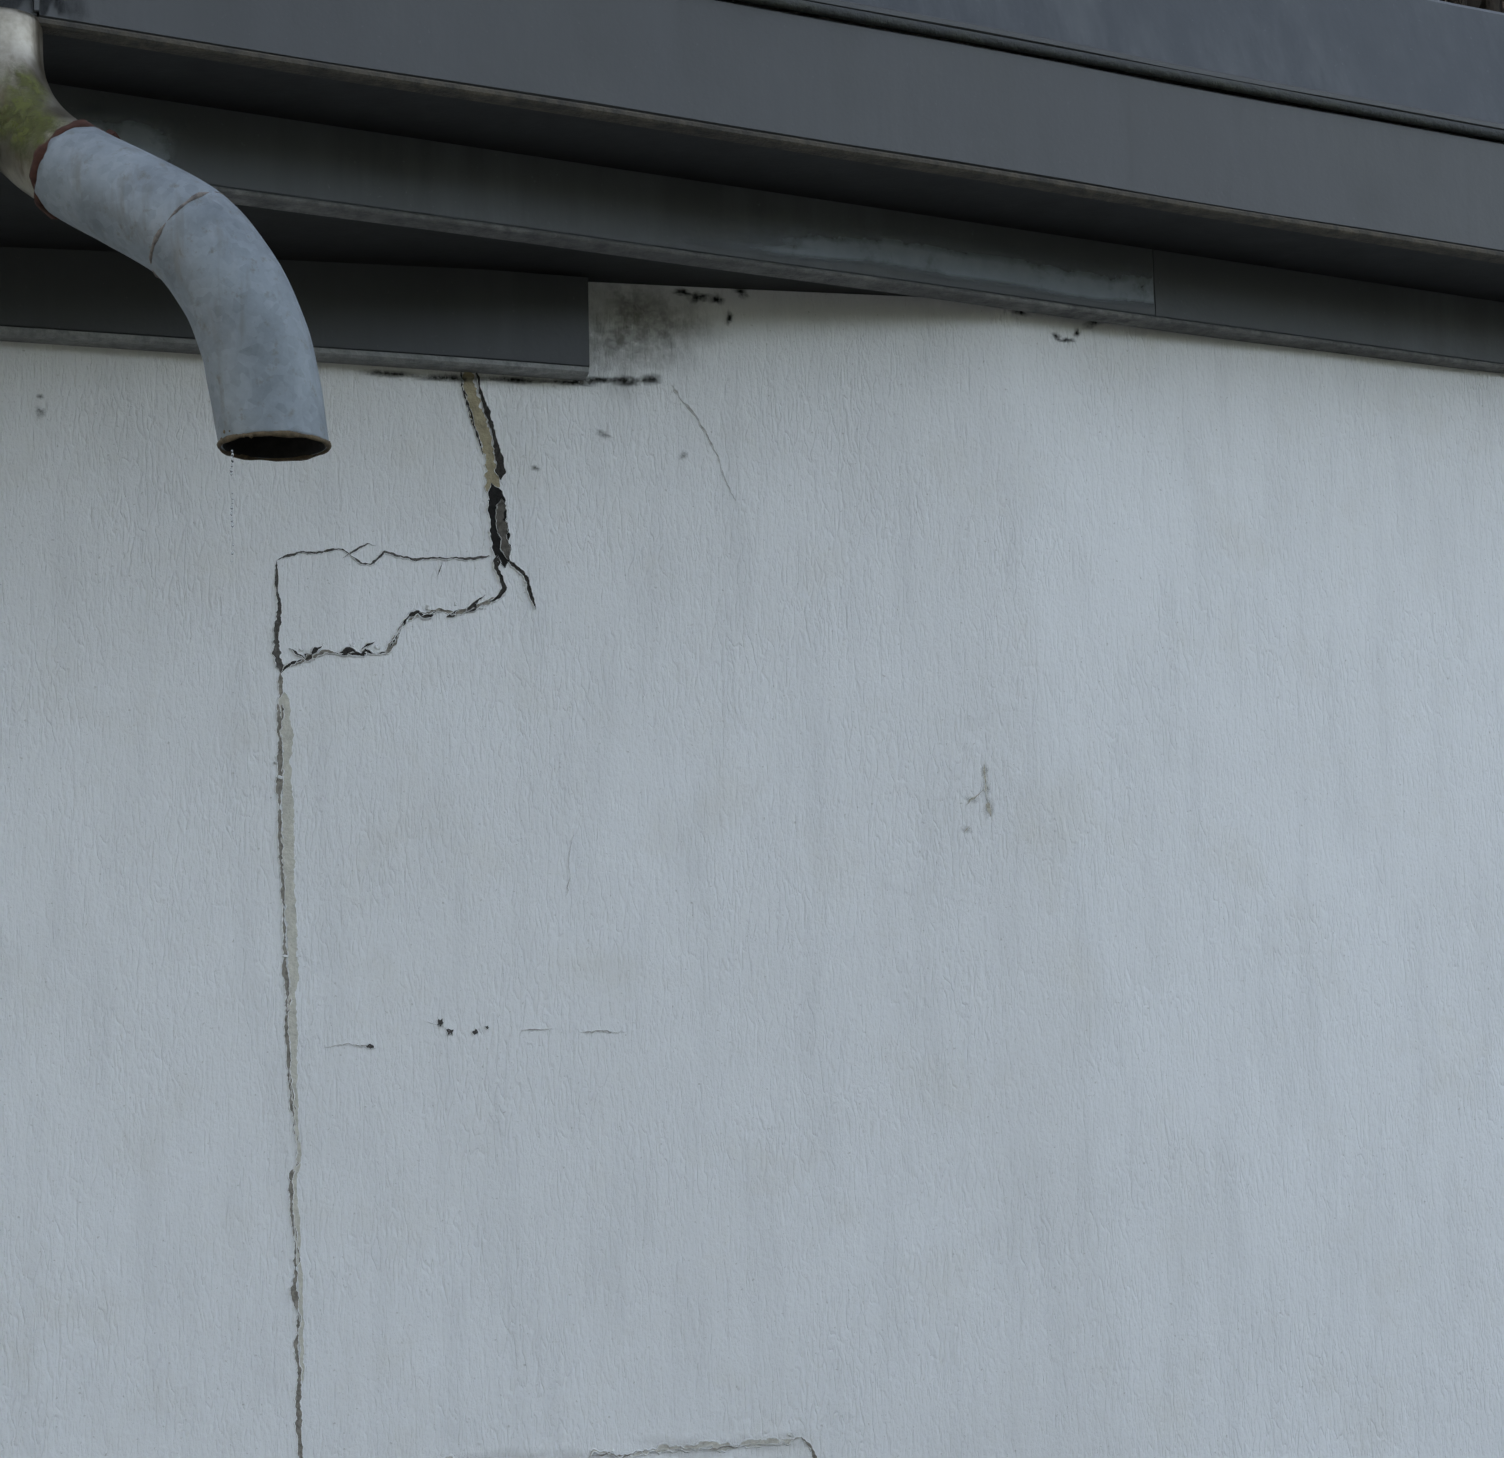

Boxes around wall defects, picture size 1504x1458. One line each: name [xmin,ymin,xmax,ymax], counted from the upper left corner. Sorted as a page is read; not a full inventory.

crack [672,385,736,501]
crack [270,372,536,1458]
crack [428,1018,627,1036]
crack [578,1432,818,1458]